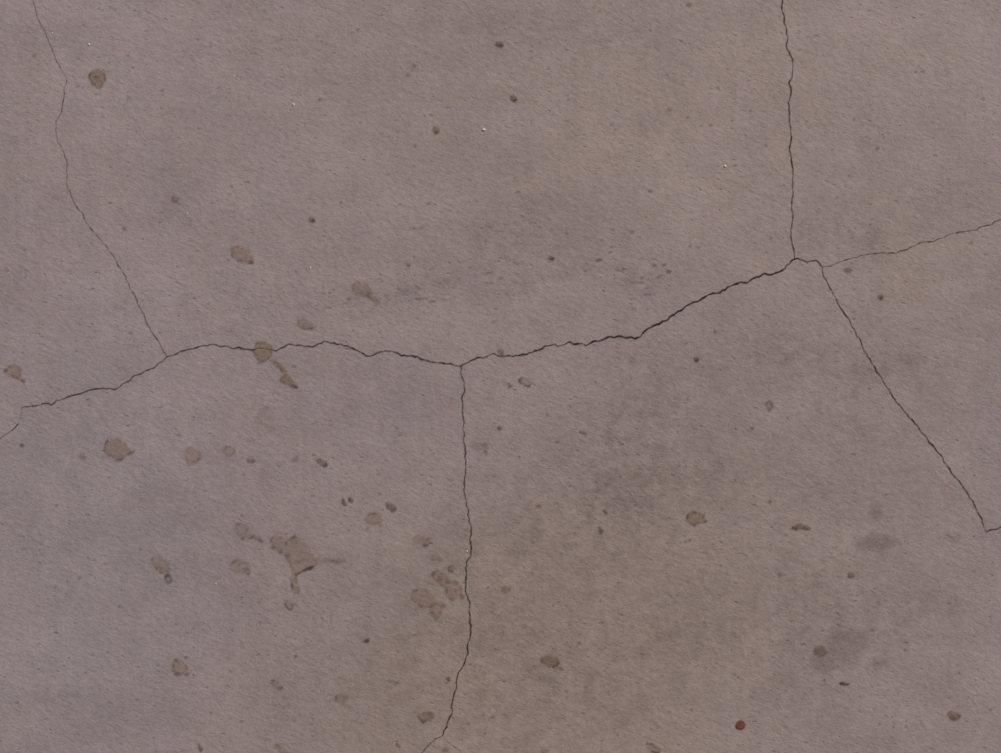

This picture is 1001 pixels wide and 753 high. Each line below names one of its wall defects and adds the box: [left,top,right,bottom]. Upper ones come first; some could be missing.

crack [781,0,794,211]
crack [24,222,1001,751]